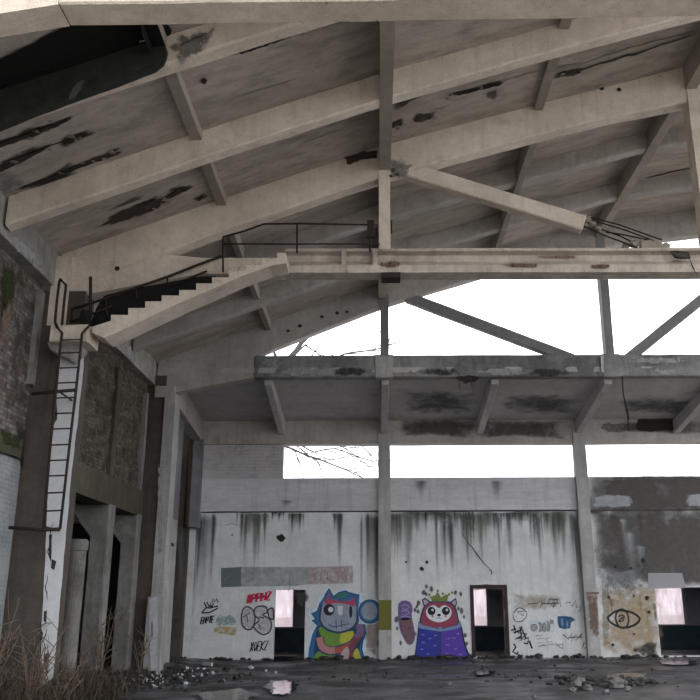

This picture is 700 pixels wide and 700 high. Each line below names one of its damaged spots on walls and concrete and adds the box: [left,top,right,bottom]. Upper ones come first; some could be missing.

spalling [170,29,214,63]
spalling [0,117,94,172]
spalling [344,150,377,165]
spalling [11,148,121,195]
spalling [137,186,192,210]
rust [507,255,574,268]
water stain [404,420,471,436]
spalling [636,419,674,432]
water stain [241,512,304,535]
water stain [391,511,578,542]
water stain [591,474,700,639]
mould [636,643,655,655]